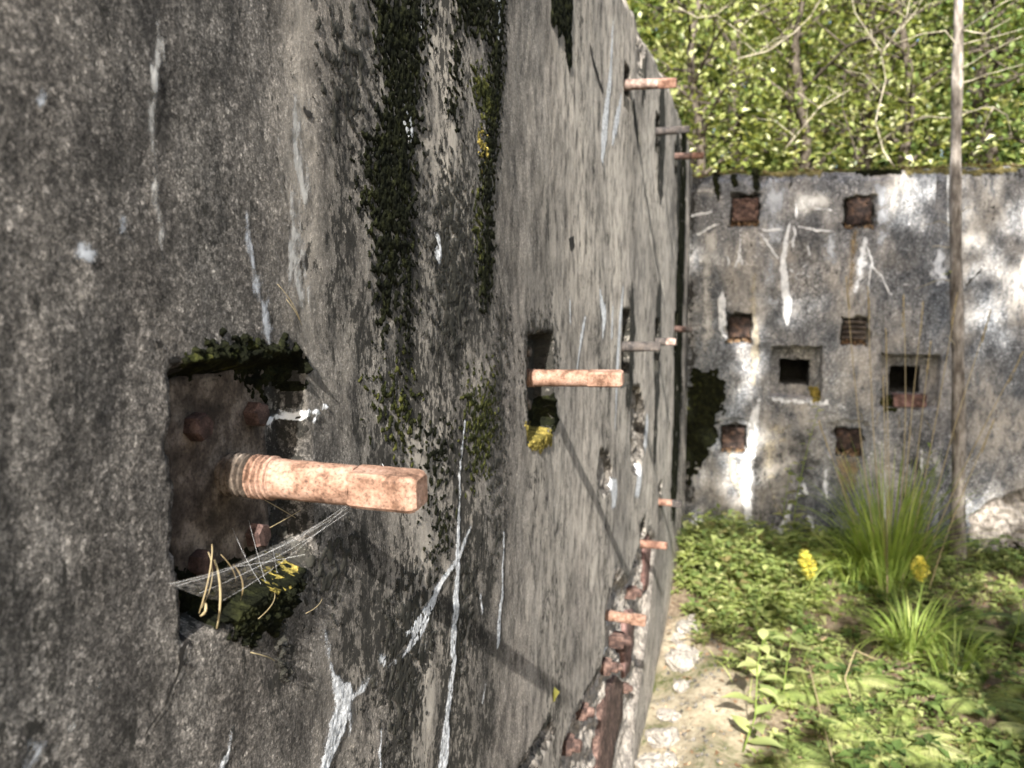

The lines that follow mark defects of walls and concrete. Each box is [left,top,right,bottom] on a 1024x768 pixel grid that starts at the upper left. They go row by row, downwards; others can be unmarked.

leakage [750,178,833,385]
leakage [821,233,837,265]
leakage [873,184,890,249]
spalling [967,487,1024,551]
spalling [517,524,656,768]